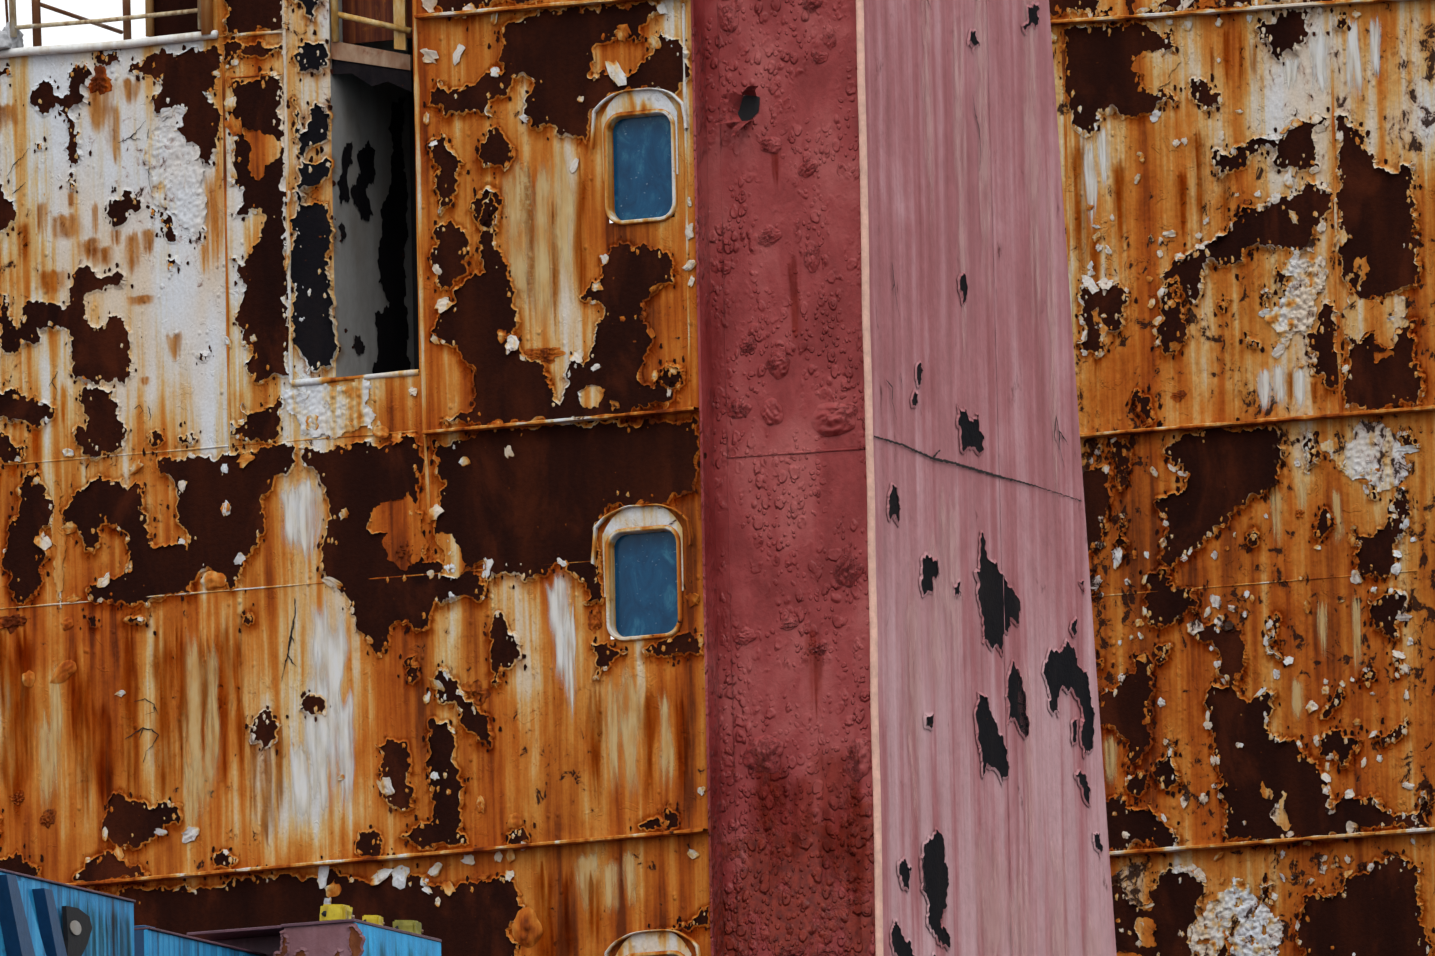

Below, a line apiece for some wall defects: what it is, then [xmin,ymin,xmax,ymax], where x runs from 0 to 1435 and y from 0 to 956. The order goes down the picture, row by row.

rust [86,231,151,265]
rust [1180,137,1202,219]
peeling [1021,0,1427,417]
damp [282,478,314,555]
peeling [0,0,710,956]
crack [874,379,1082,502]
rust [154,634,185,759]
rust [200,639,282,797]
damp [291,606,353,817]
peeling [919,530,1030,787]
peeling [1041,384,1435,956]
peeling [897,827,951,956]